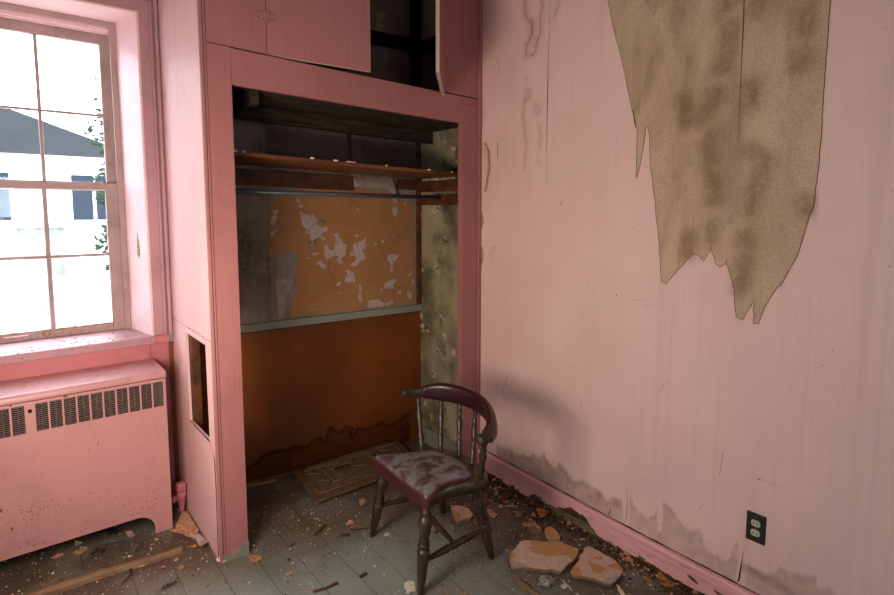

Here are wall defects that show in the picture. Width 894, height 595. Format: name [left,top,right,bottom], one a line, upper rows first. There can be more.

peeling [608,0,831,324]
peeling [267,183,415,317]
spalling [486,470,723,595]